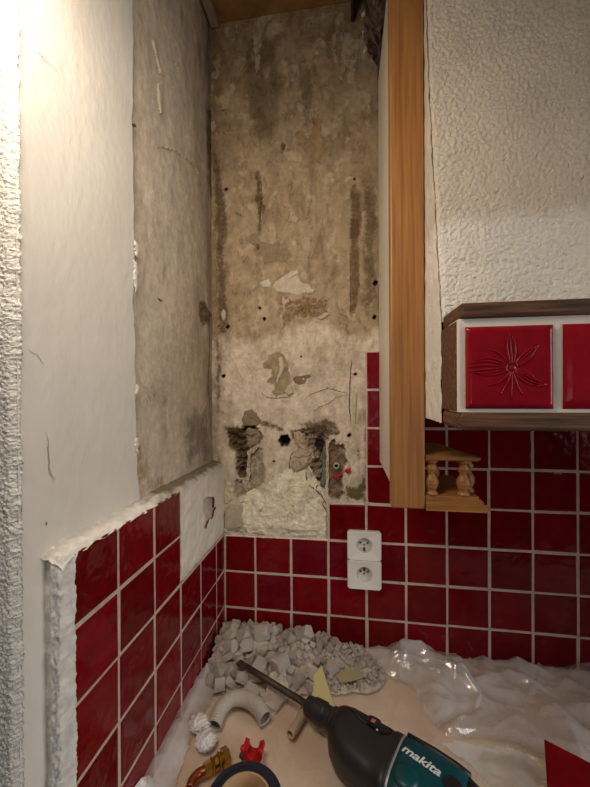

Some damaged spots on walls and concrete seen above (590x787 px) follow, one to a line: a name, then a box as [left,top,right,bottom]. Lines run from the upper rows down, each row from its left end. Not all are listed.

damp [199,109,227,333]
damp [254,172,265,219]
flaking render [247,232,329,328]
damp [350,185,362,311]
peeling [263,351,311,397]
crack [264,359,354,423]
flaking render [226,409,268,502]
flaking render [277,424,351,502]